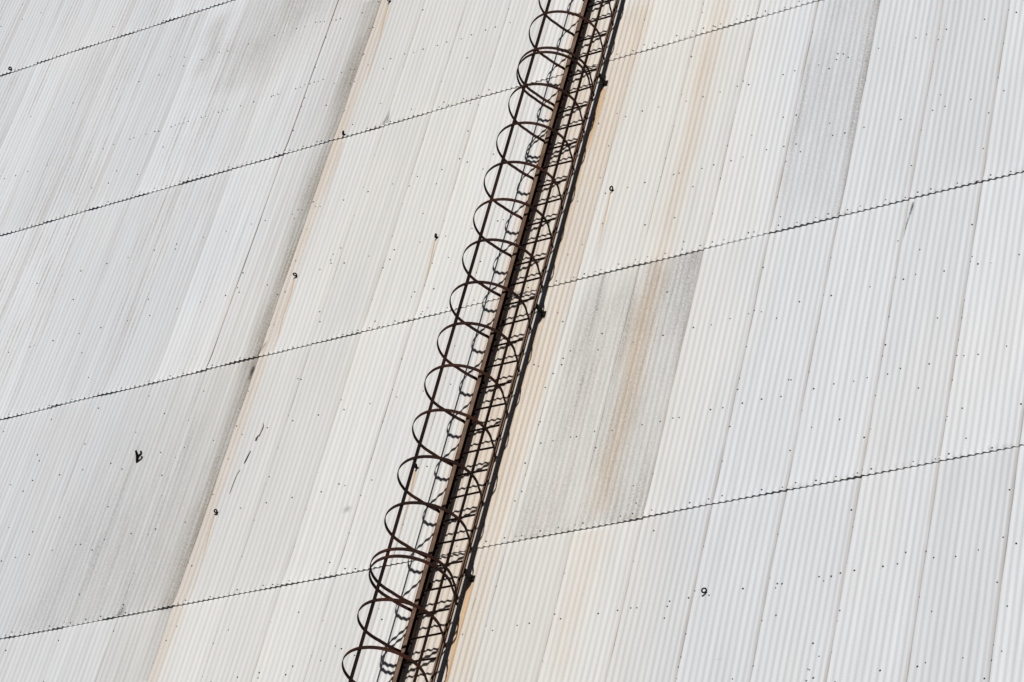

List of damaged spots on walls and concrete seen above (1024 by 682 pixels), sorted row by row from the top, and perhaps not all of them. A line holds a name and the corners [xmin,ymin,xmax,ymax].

rust [584,88,612,156]
rust [403,162,564,682]